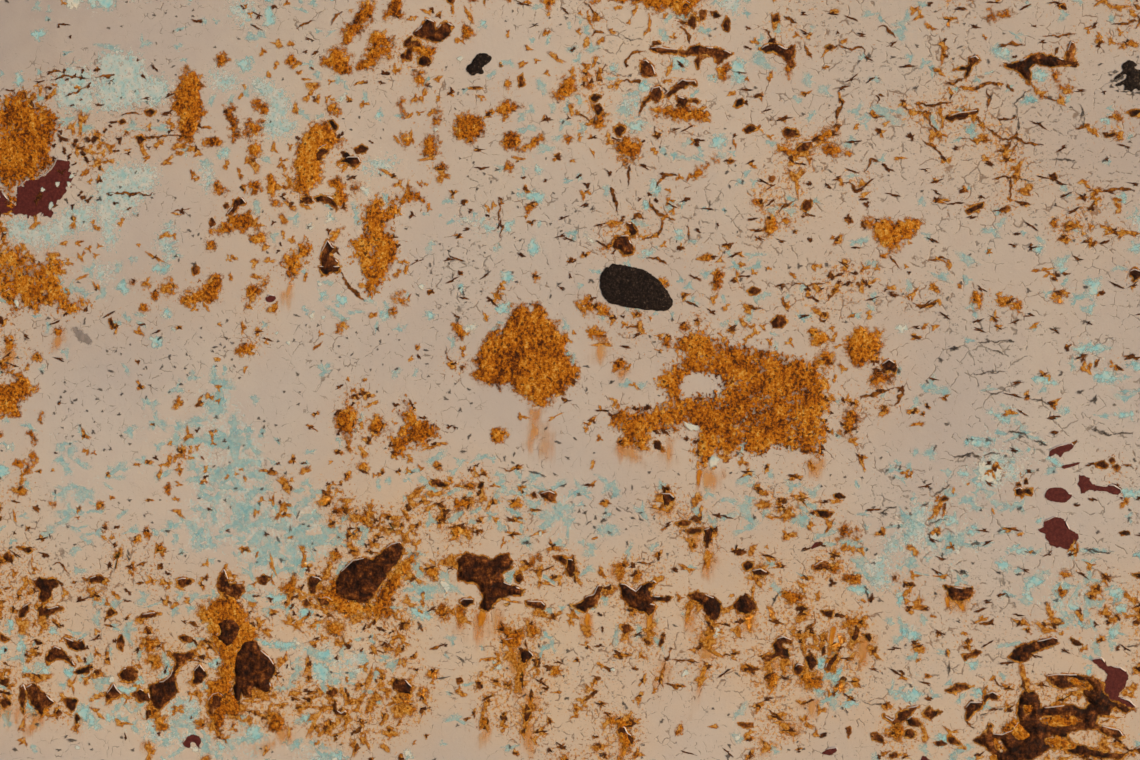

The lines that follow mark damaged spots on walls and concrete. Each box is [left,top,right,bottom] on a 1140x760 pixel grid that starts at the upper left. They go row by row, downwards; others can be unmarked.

peeling [0,134,163,295]
corrosion [0,0,711,374]
spalling [600,221,673,311]
crack [584,2,691,135]
crack [610,166,690,264]
corrosion [842,216,942,308]
crack [869,50,1135,206]
crack [998,0,1140,55]
corrosion [86,377,582,760]
corrosion [446,245,897,760]
peeling [957,436,1140,503]
peeling [933,657,1140,760]